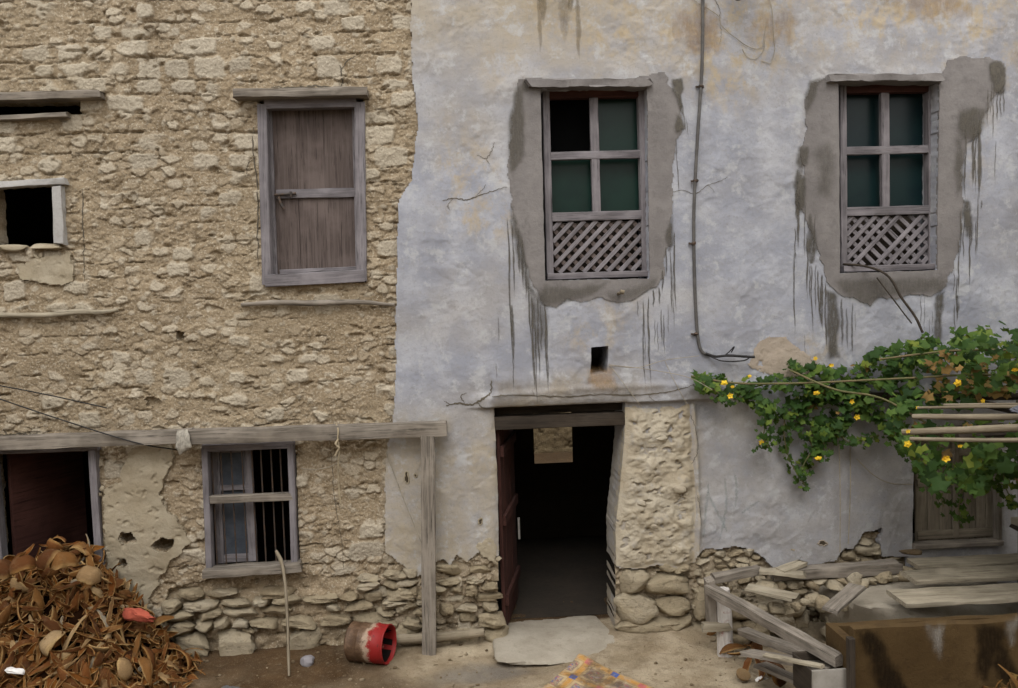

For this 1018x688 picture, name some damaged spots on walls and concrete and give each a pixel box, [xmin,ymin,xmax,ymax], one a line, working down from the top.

crack [443,144,504,209]
leakage [807,80,818,107]
leakage [957,61,1006,191]
leakage [507,220,596,392]
leakage [793,147,853,357]
leakage [935,201,982,339]
flaking render [99,444,192,616]
spalling [371,556,422,633]
spalling [436,537,509,644]